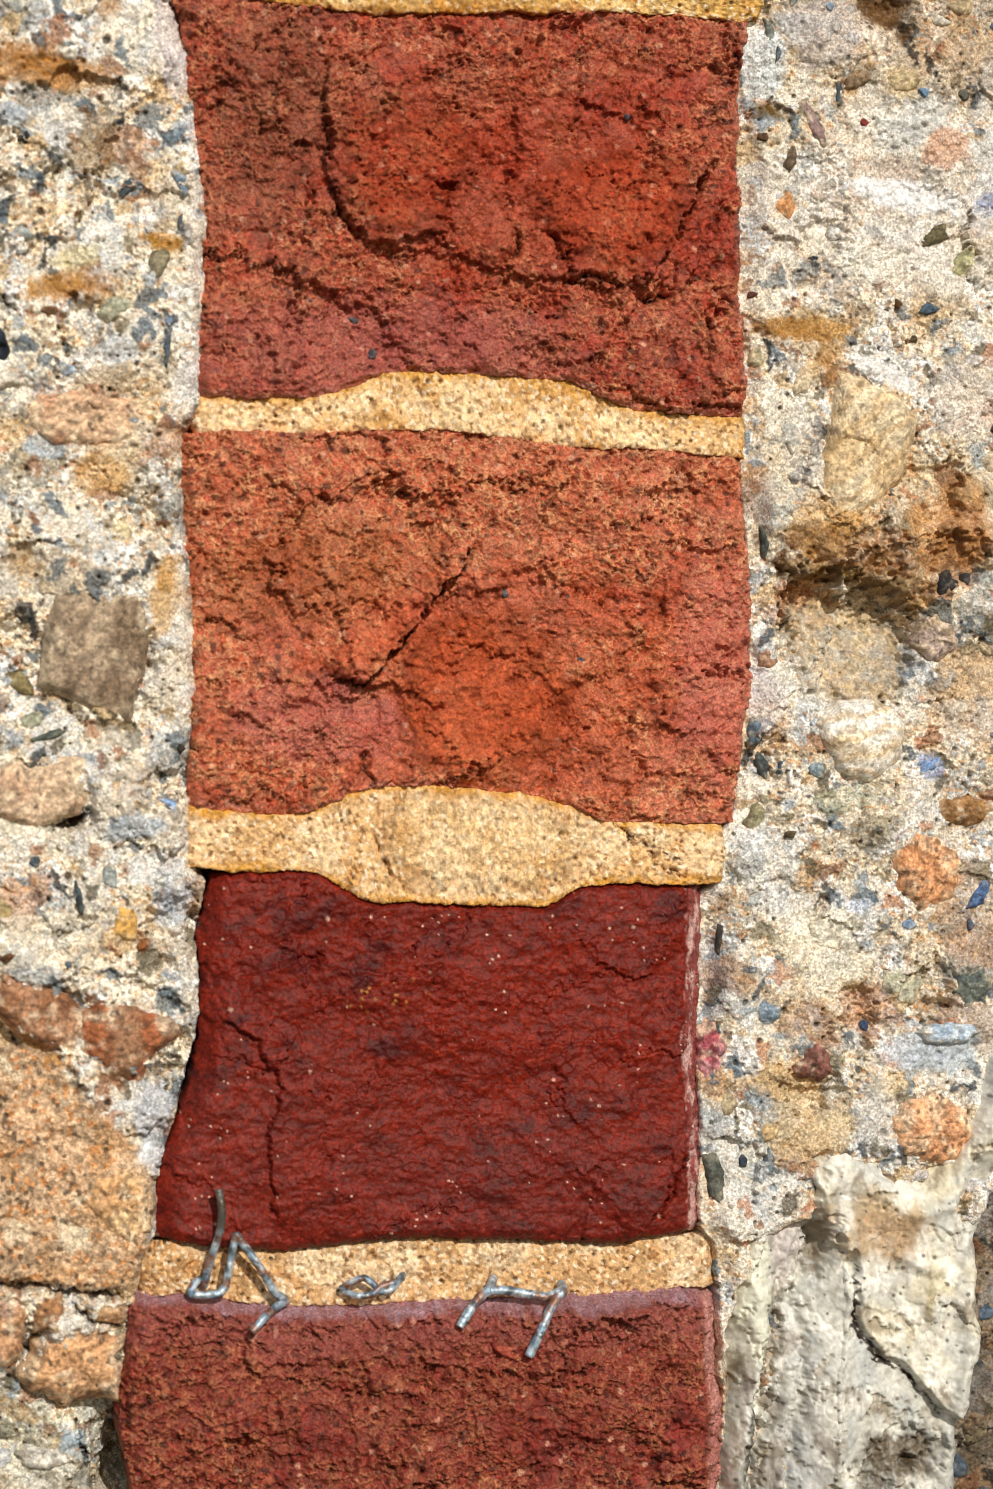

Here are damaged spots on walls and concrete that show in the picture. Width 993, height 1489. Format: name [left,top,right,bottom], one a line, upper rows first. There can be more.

crack [326,564,467,688]
crack [850,1265,941,1410]